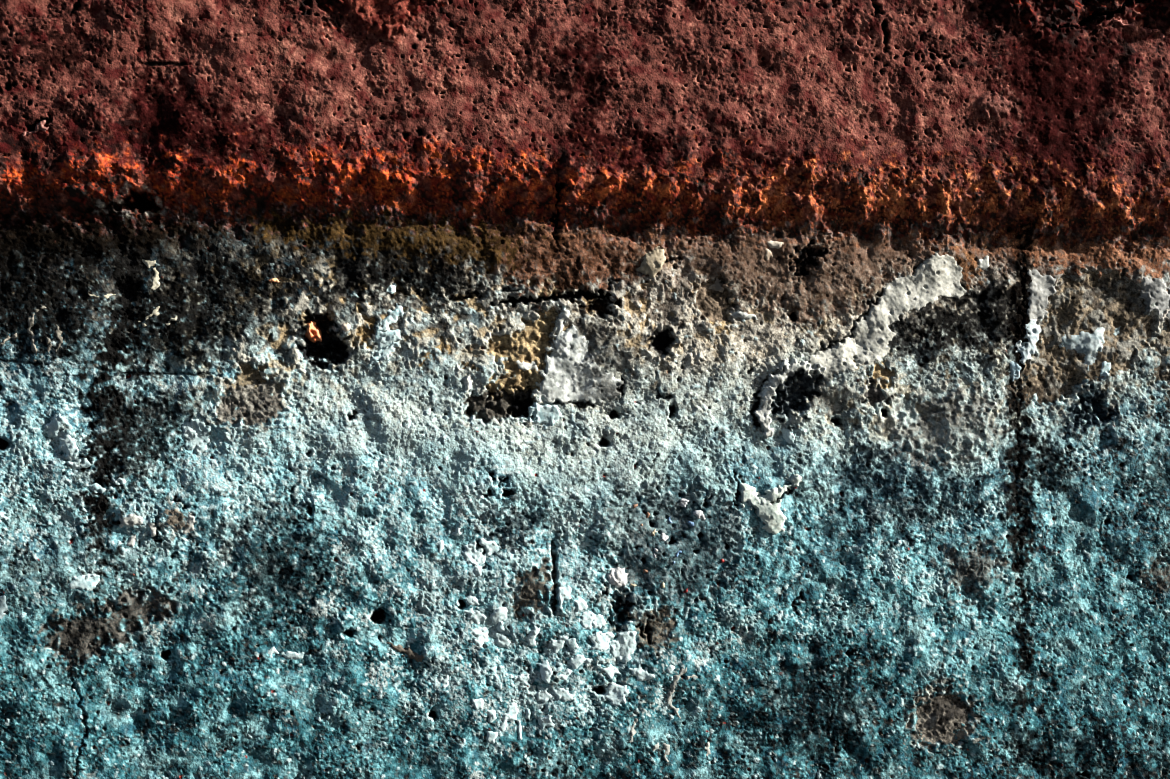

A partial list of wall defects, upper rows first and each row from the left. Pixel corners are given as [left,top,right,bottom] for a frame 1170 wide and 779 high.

leakage [322,239,483,313]
spalling [0,130,1170,454]
corrosion [681,219,923,328]
leakage [0,194,295,606]
leakage [209,468,354,646]
peeling [437,527,502,576]
peeling [464,472,802,744]